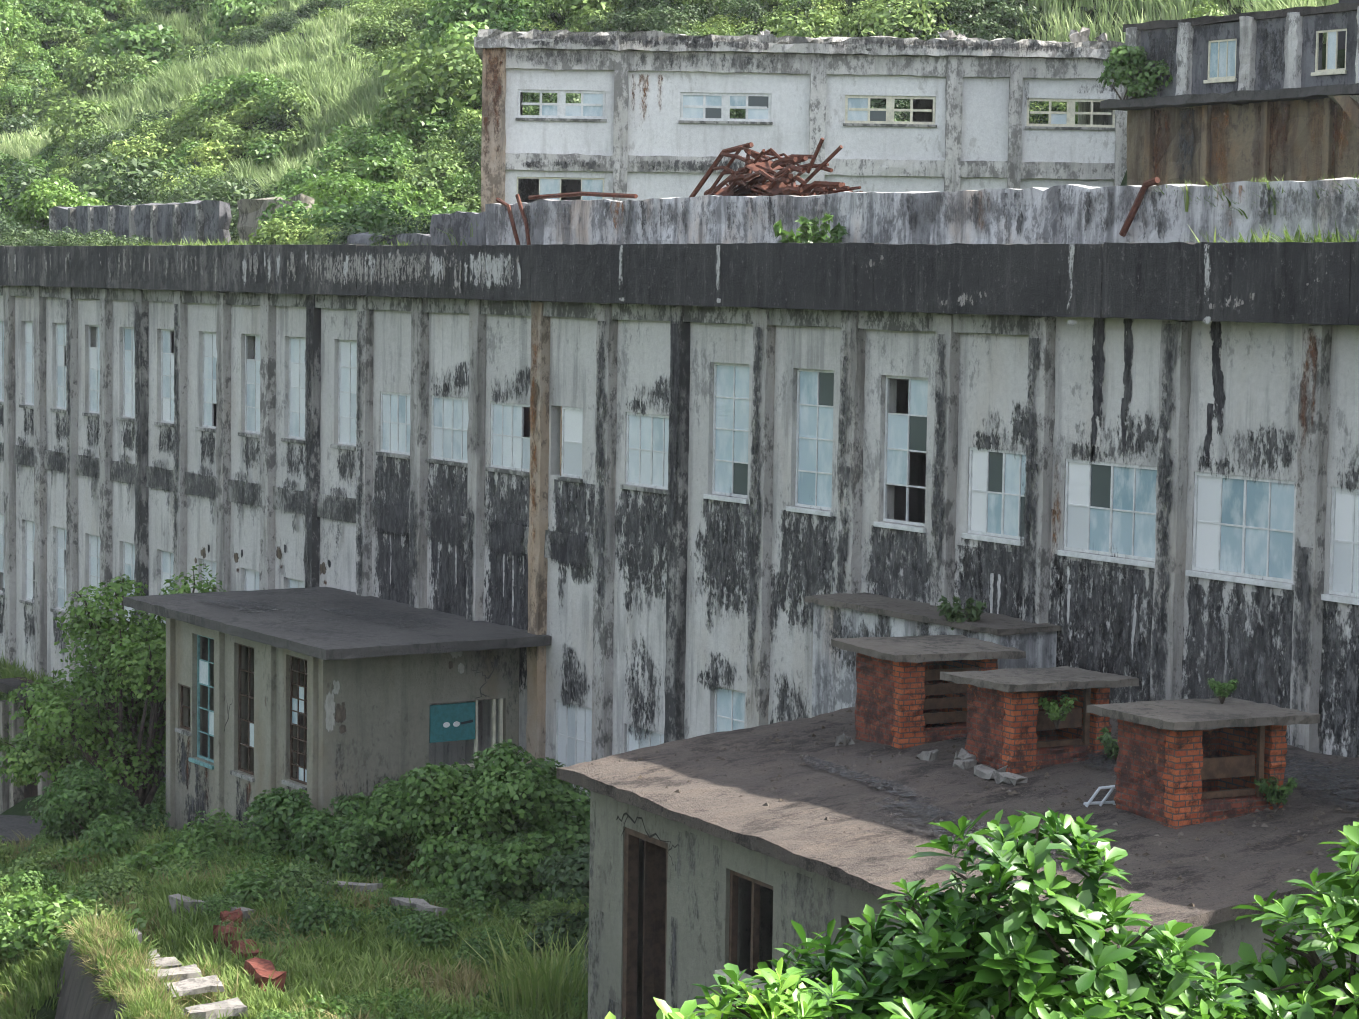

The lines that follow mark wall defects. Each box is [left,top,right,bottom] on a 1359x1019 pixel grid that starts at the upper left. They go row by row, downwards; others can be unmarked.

corrosion [483,48,505,186]
damp [523,159,600,169]
damp [640,160,753,172]
damp [604,199,687,302]
damp [716,195,831,303]
damp [0,300,530,630]
corrosion [530,313,538,536]
damp [548,321,891,692]
damp [24,597,35,643]
damp [561,644,589,707]
damp [625,634,662,740]
damp [770,675,810,724]